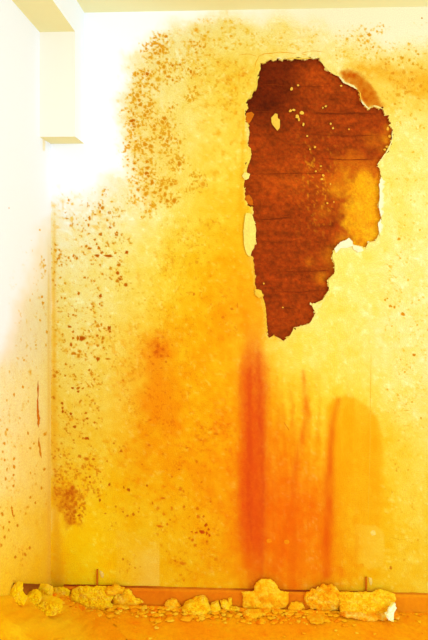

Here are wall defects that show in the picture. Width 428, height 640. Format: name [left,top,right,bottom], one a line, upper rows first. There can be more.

spalling [236,50,400,349]
corrosion [230,324,313,590]
corrosion [316,396,342,584]